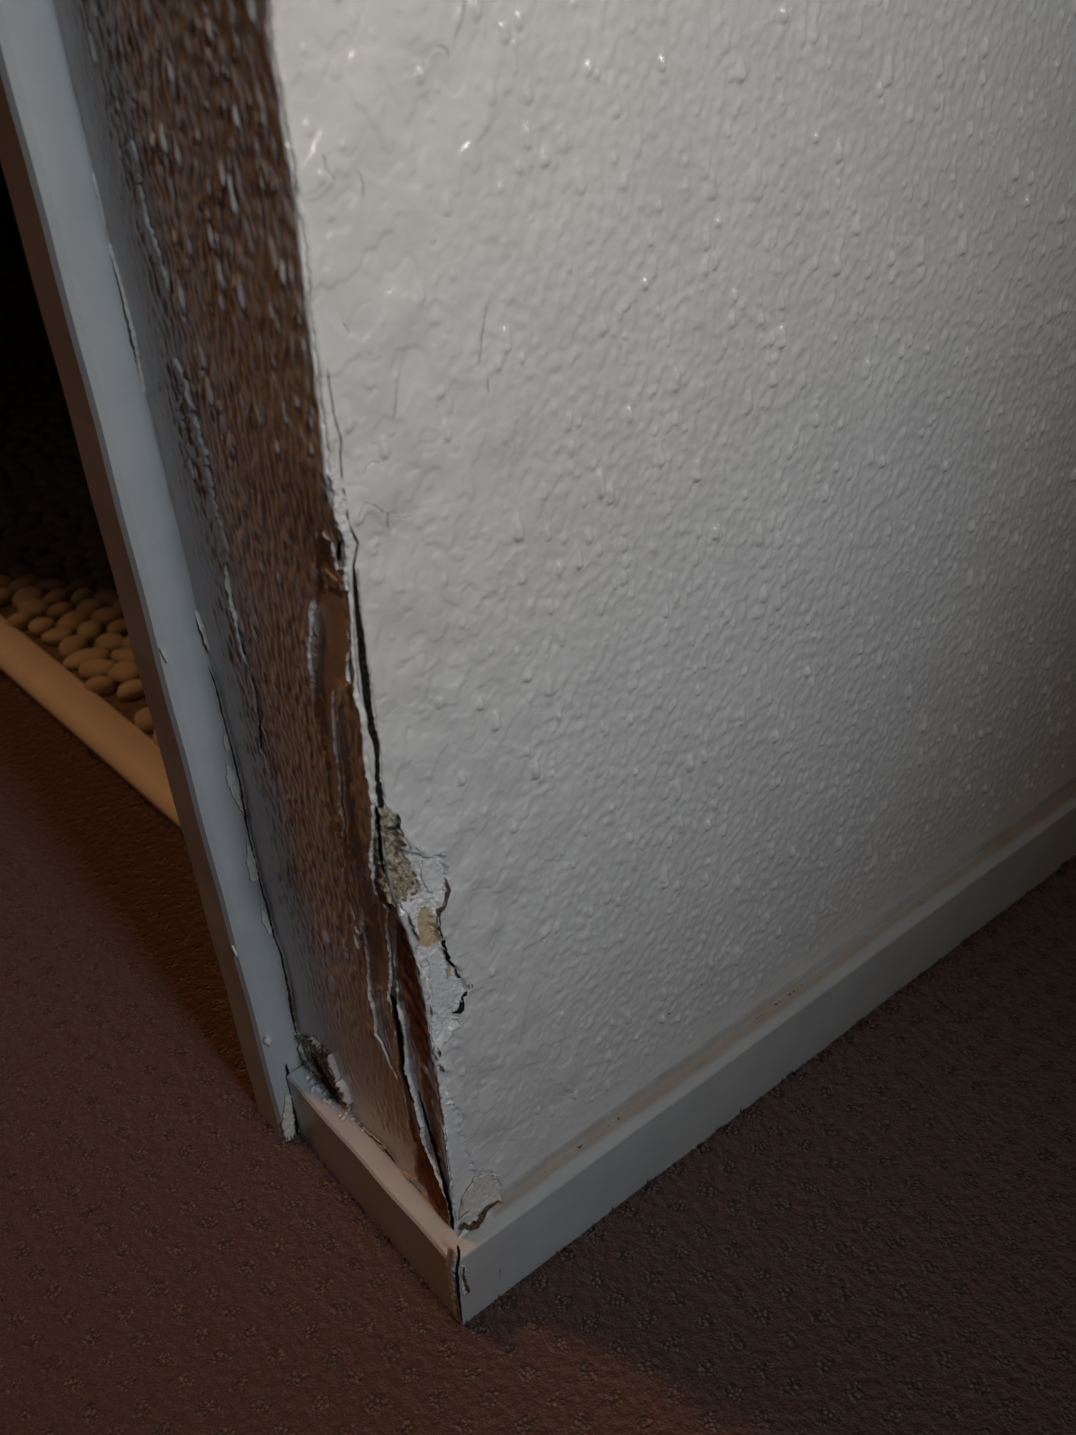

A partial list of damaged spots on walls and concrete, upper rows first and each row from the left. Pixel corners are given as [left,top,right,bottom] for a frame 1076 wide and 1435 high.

spalling [268,0,504,1228]
crack [328,372,504,1321]